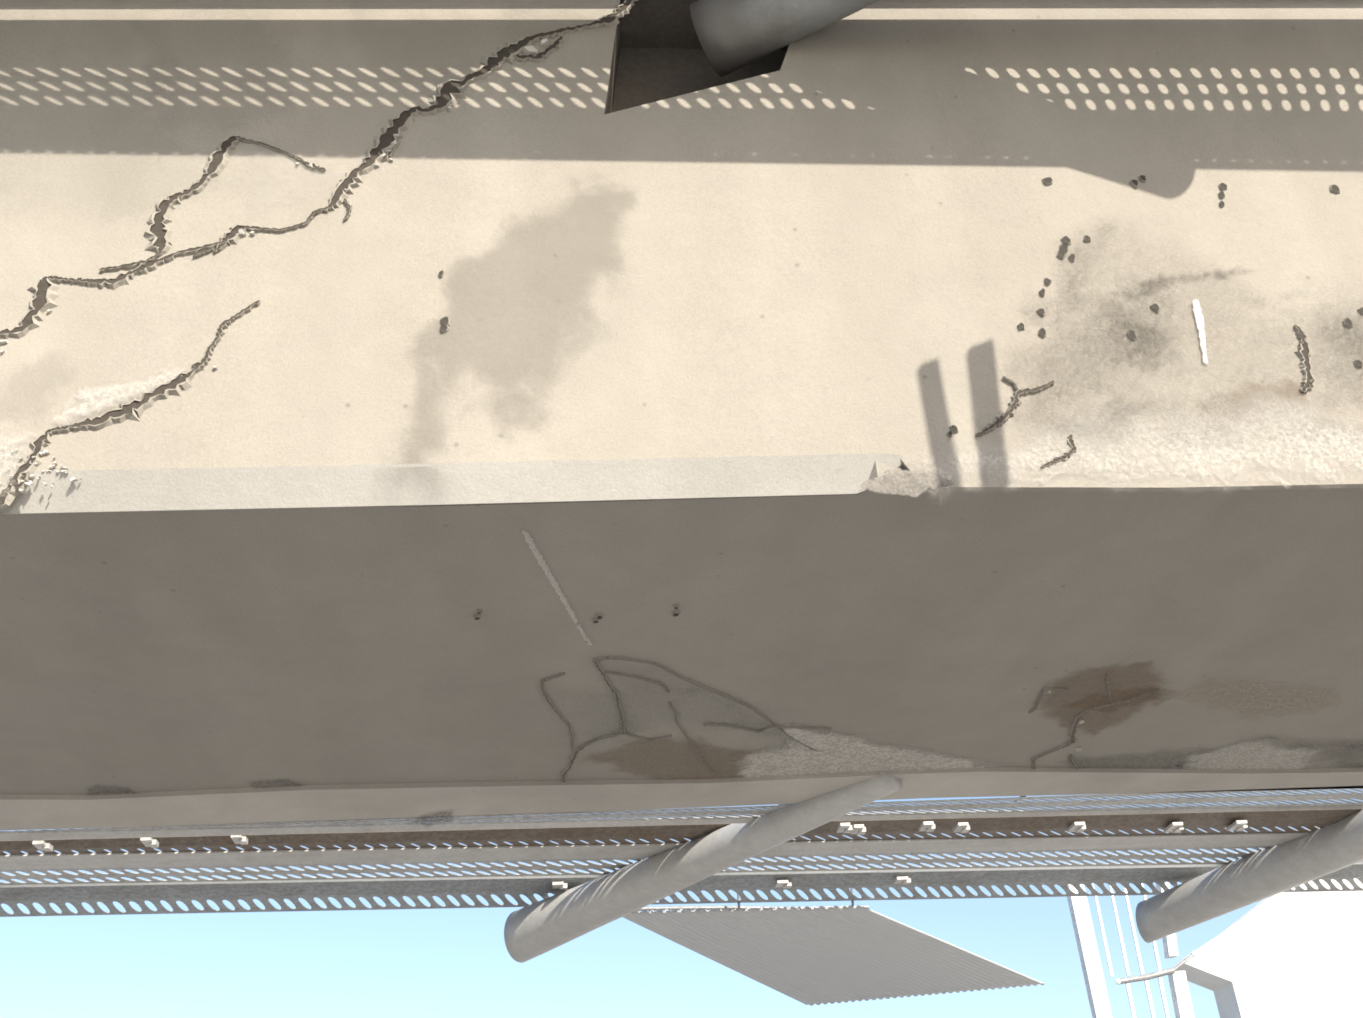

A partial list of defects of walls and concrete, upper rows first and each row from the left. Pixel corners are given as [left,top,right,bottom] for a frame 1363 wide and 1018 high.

crack [0,0,638,354]
crack [0,300,261,510]
damp [941,398,1363,481]
crack [540,656,831,782]